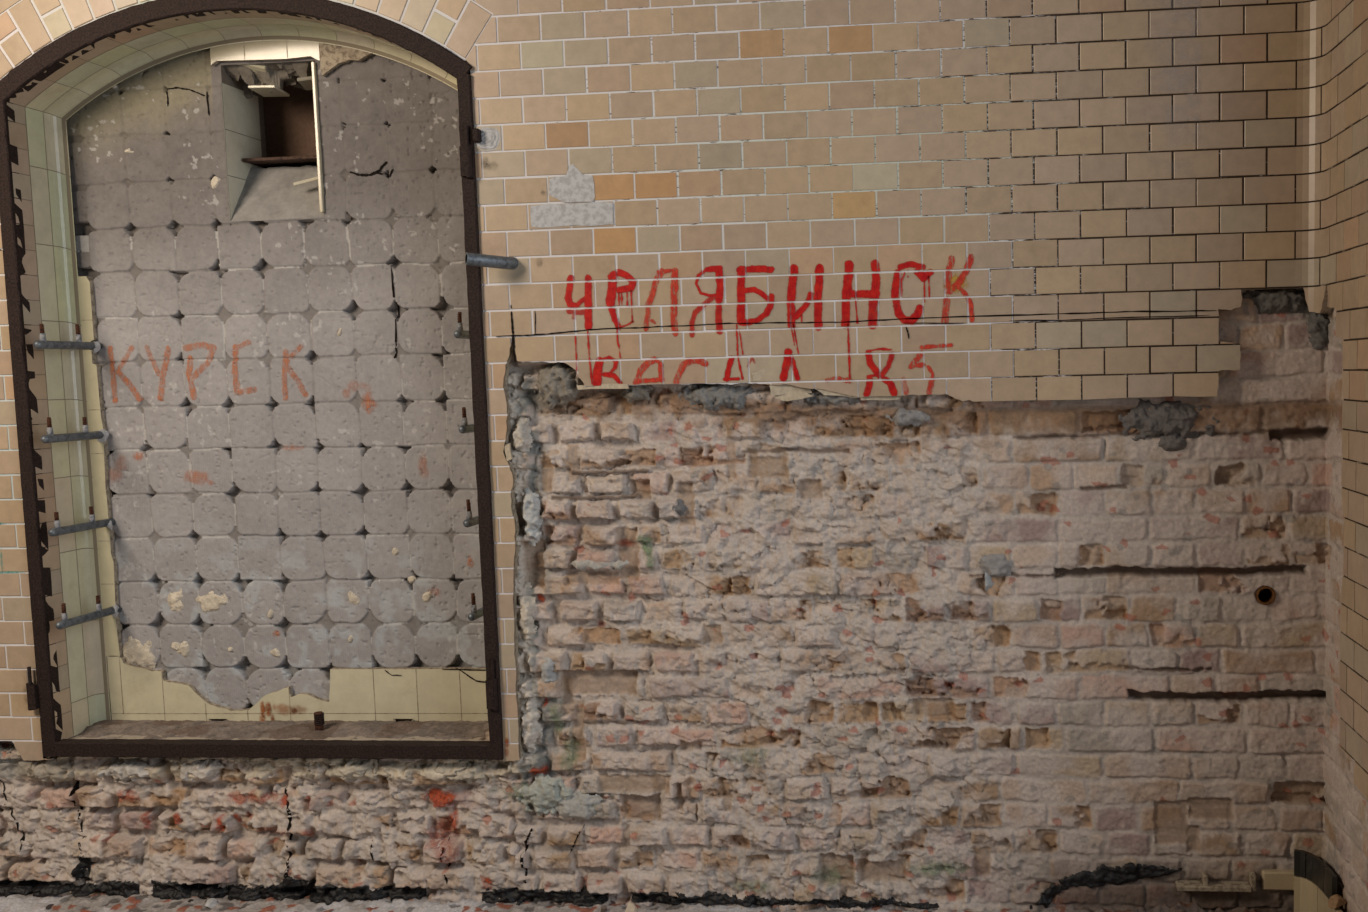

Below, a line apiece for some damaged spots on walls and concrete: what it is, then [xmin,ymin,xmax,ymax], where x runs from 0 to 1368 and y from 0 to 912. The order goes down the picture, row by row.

crack [166,87,210,115]
crack [350,161,393,177]
spalling [66,43,486,713]
crack [391,268,400,358]
crack [496,306,1217,363]
spalling [0,288,1368,912]